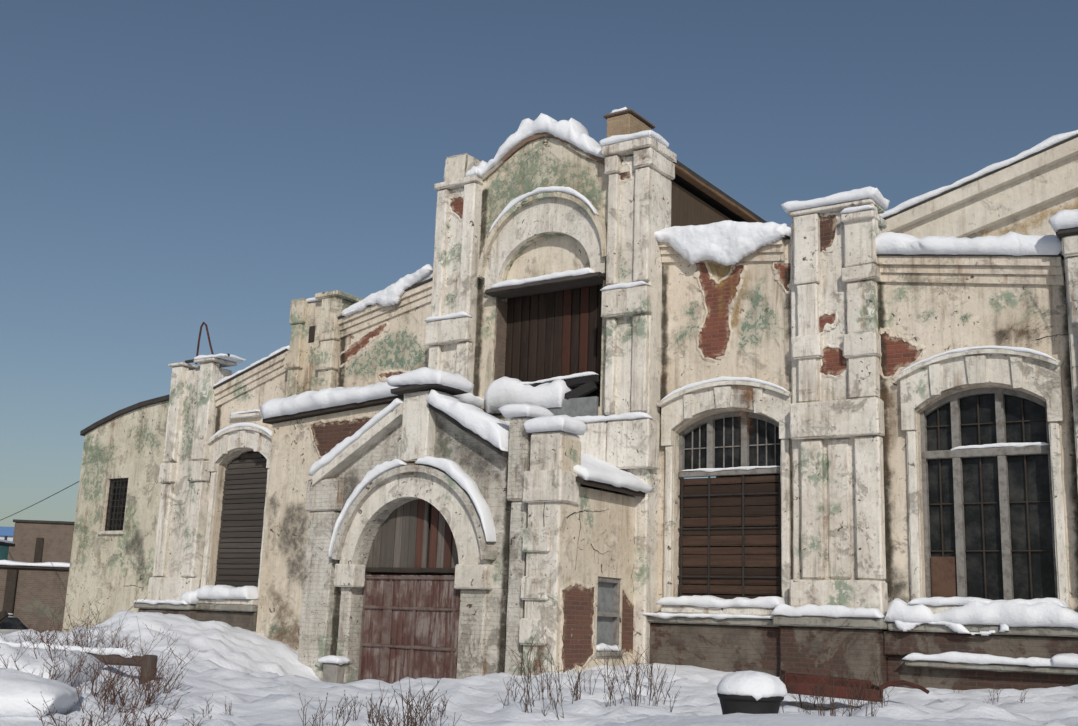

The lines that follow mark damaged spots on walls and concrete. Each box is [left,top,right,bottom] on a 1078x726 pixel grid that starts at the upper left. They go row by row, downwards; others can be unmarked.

spalling [449,194,464,222]
spalling [819,211,841,256]
spalling [676,262,776,363]
spalling [338,321,427,382]
spalling [819,310,848,380]
spalling [878,327,929,381]
spalling [307,413,377,459]
leakage [129,533,143,565]
crack [543,503,610,570]
spalling [559,578,598,673]
spalling [622,590,635,658]